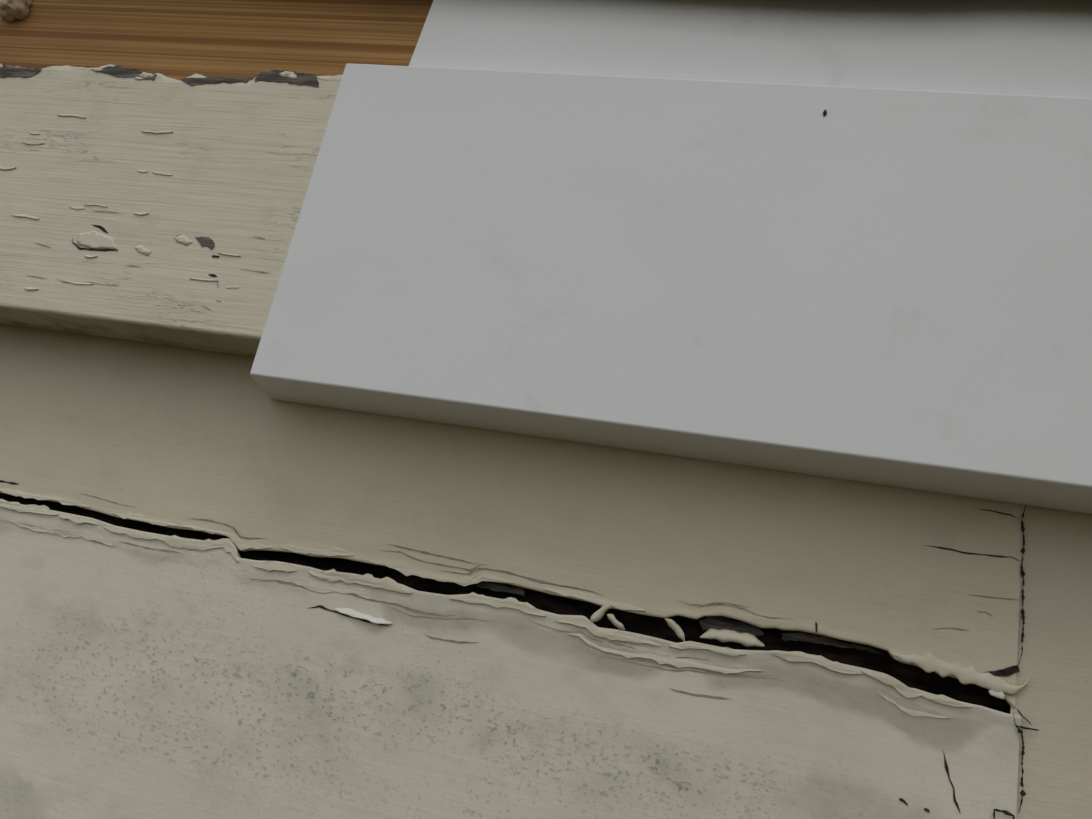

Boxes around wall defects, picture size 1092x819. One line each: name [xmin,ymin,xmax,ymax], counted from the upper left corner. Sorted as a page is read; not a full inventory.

peeling [0,64,42,78]
peeling [91,65,157,80]
peeling [181,70,319,87]
peeling [72,225,118,258]
peeling [174,235,241,258]
peeling [307,605,393,627]
crack [0,480,1039,819]